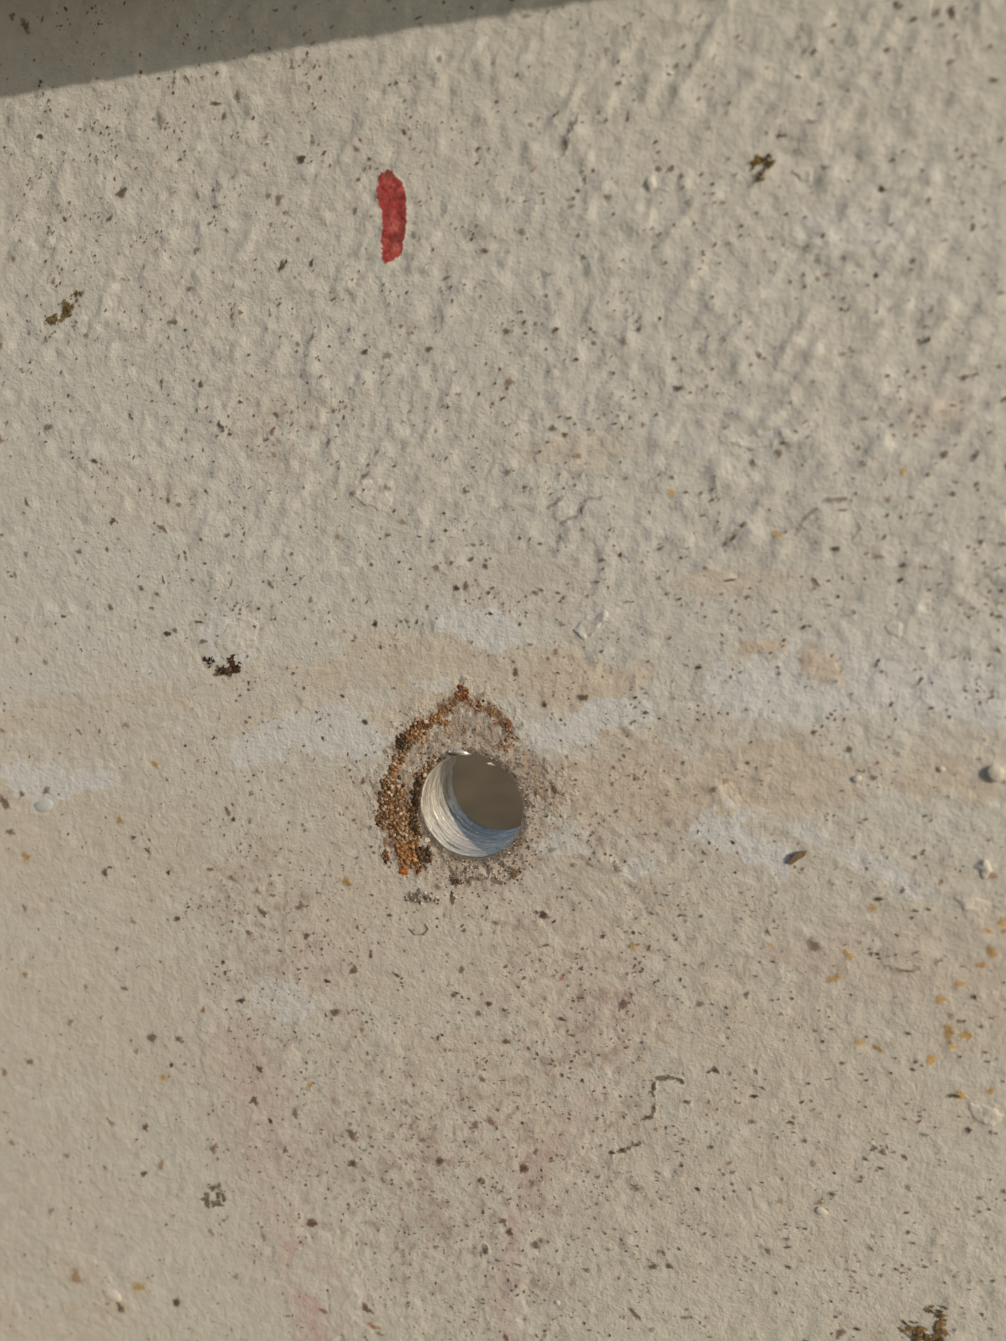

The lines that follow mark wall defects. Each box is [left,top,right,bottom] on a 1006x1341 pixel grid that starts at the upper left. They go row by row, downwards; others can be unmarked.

rust [362,675,579,907]